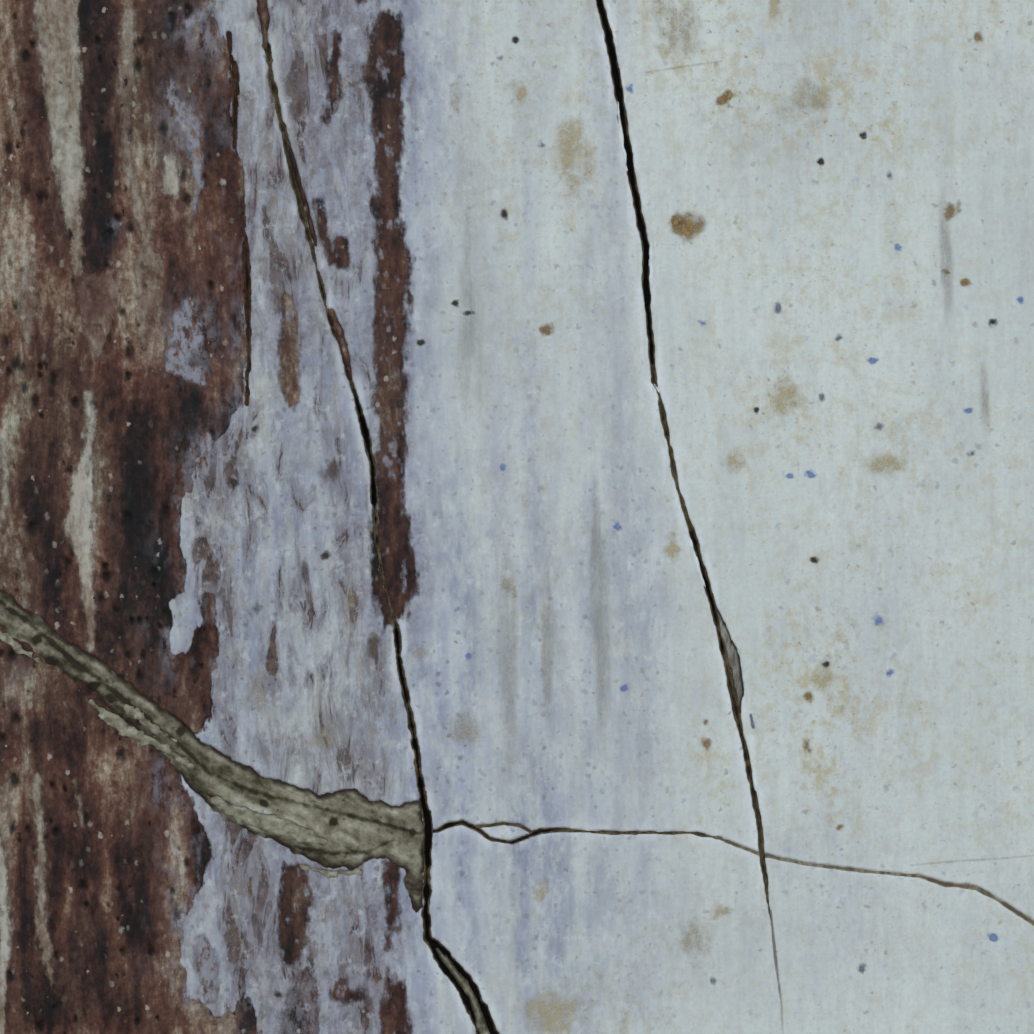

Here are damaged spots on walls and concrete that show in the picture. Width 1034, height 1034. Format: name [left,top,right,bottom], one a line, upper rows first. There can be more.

peeling [321,31,342,124]
peeling [313,198,350,268]
peeling [0,0,251,735]
peeling [278,293,301,407]
peeling [362,10,419,629]
crack [257,0,1034,1034]
peeling [0,625,262,1034]
peeling [210,796,328,844]
peeling [277,862,365,1034]
peeling [382,860,401,950]
peeling [379,969,412,1034]